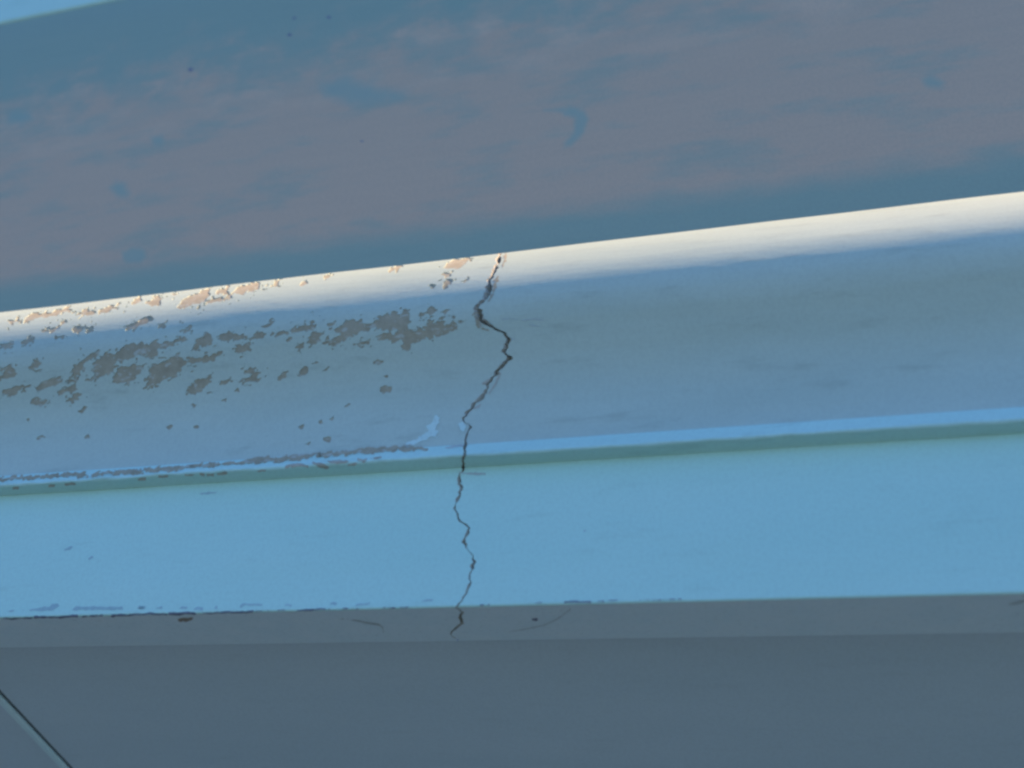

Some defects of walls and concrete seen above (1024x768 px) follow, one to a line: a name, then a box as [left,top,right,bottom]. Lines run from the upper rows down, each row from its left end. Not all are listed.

spalling [429,258,471,289]
peeling [0,279,464,413]
peeling [0,437,428,490]
crack [445,253,513,640]